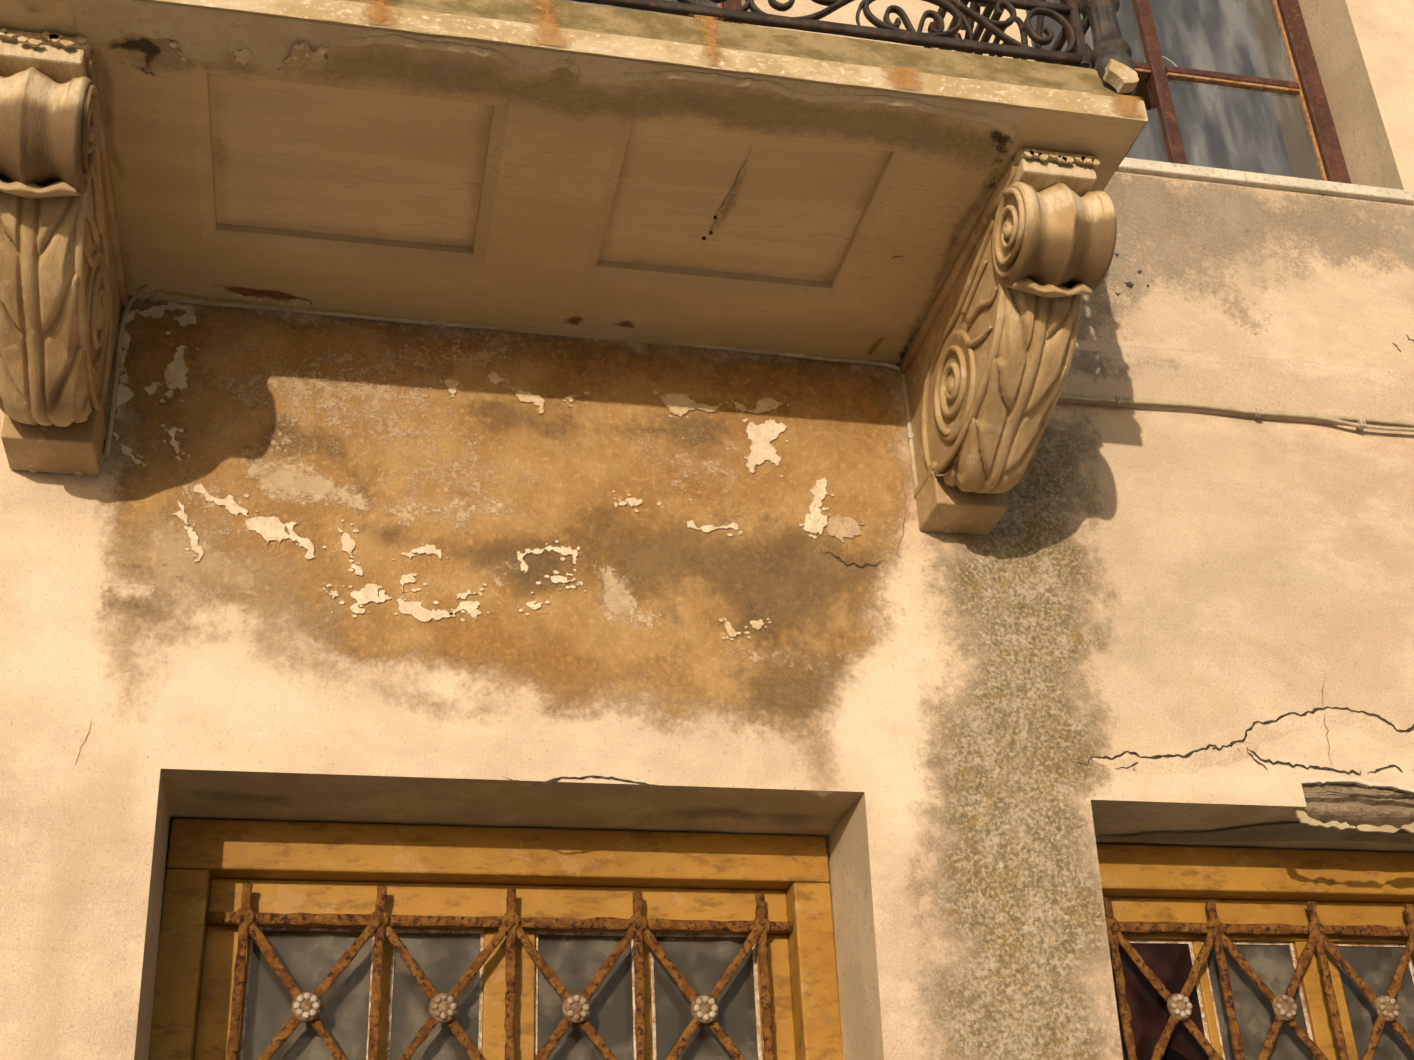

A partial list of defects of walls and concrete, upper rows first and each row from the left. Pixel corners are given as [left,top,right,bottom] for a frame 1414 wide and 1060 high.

corrosion [535,0,565,46]
peeling [0,0,1100,167]
corrosion [695,15,720,65]
corrosion [889,66,919,90]
water stain [1072,173,1414,375]
peeling [653,391,789,478]
peeling [194,484,490,623]
water stain [110,303,913,773]
peeling [516,540,586,616]
crack [1070,680,1414,775]
crack [501,775,664,823]
spalling [1294,777,1414,834]